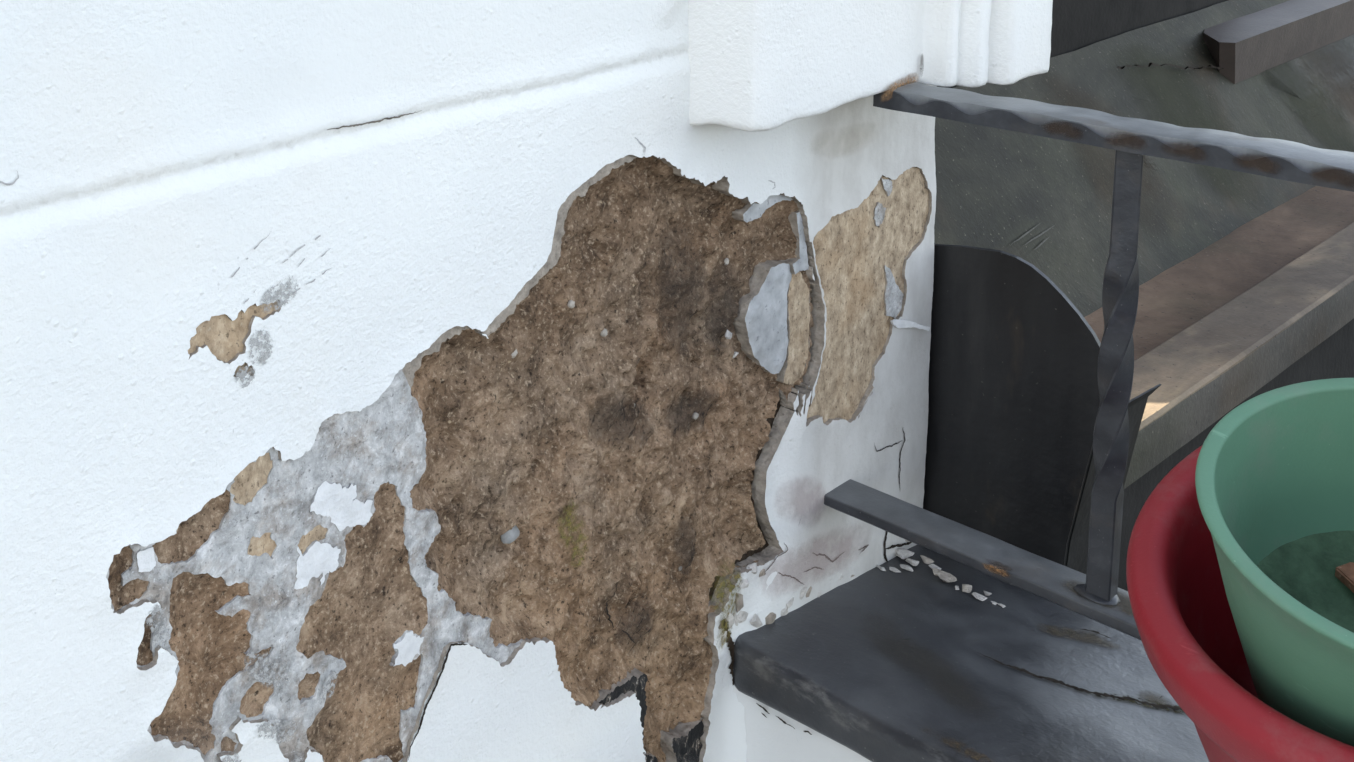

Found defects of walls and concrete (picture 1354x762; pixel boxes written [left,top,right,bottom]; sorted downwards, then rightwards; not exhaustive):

spalling [106,155,930,762]
crack [977,652,1184,714]